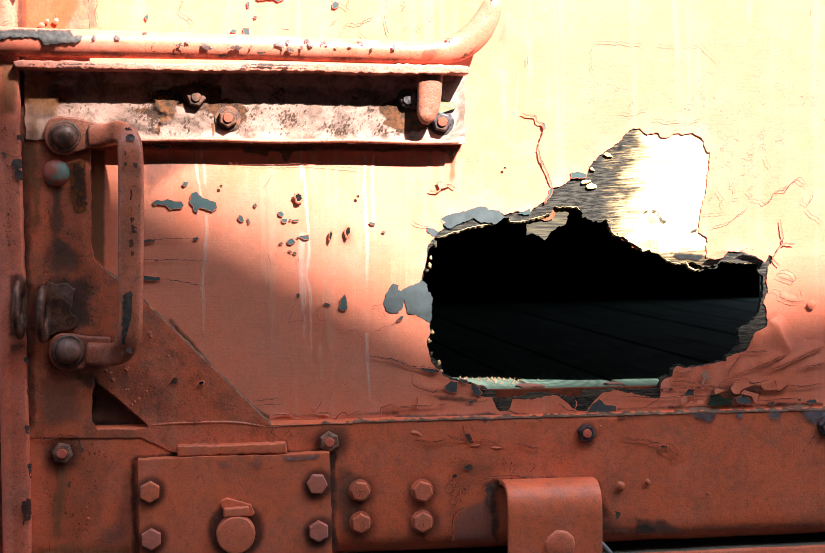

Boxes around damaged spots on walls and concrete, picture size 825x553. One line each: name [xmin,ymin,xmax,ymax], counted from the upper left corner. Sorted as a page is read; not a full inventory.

peeling [0,12,82,45]
rust [136,81,247,136]
rust [379,99,430,134]
peeling [152,181,217,213]
crack [709,177,821,229]
peeling [426,206,505,237]
peeling [708,250,728,259]
peeling [742,248,769,262]
crack [770,219,802,302]
peeling [384,280,433,322]
peeling [445,378,488,405]
peeling [681,370,789,411]